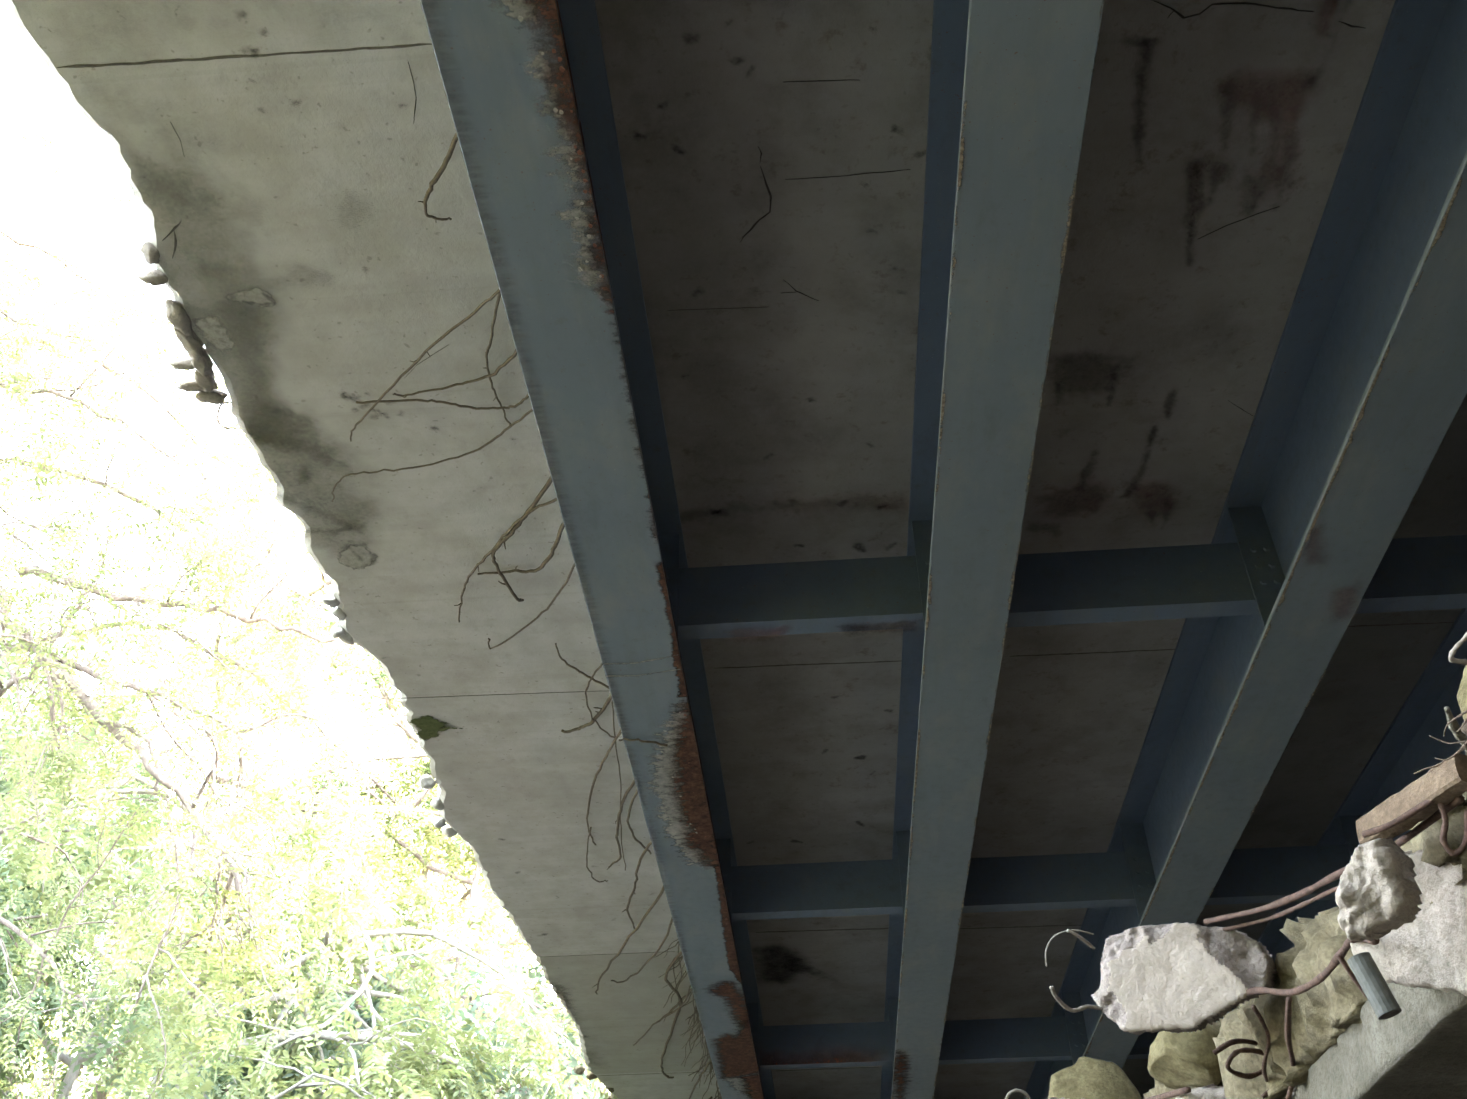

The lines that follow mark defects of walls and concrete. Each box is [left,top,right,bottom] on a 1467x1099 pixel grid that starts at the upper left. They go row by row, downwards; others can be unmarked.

spalling [133,241,235,405]
corrosion [523,0,644,471]
crack [1152,0,1366,29]
peeling [1199,344,1390,789]
corrosion [656,562,865,1099]
corrosion [892,729,921,1099]